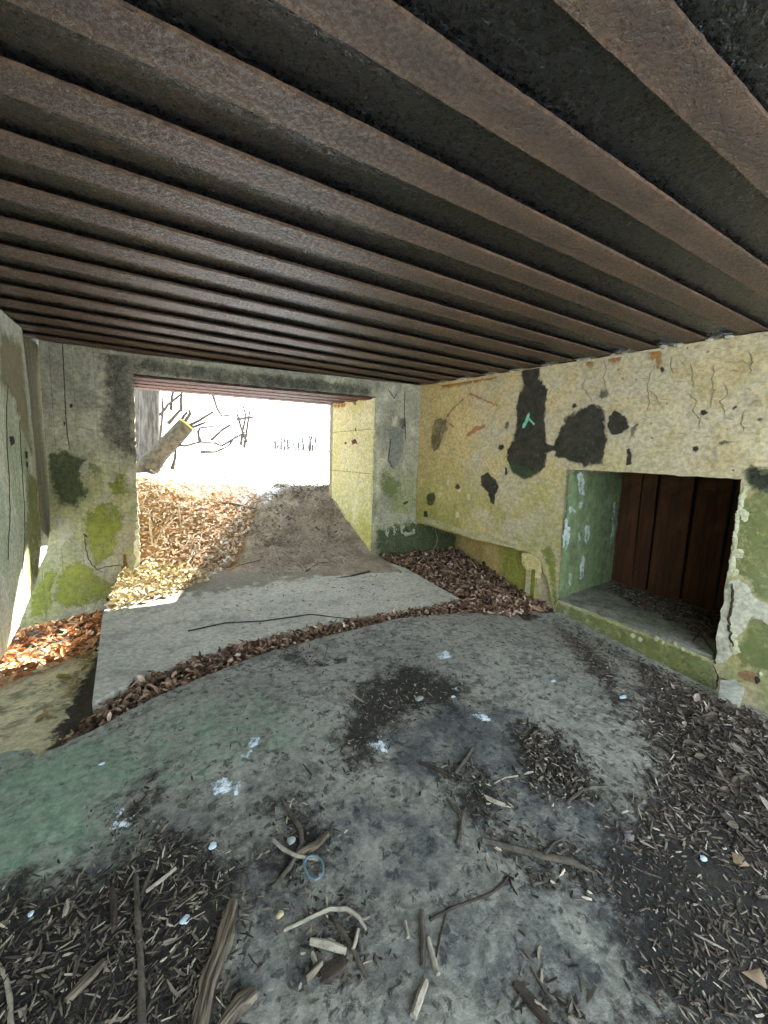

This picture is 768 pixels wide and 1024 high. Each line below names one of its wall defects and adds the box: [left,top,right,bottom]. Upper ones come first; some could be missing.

crack [642,358,745,432]
spalling [715,486,768,664]
spalling [738,670,763,684]